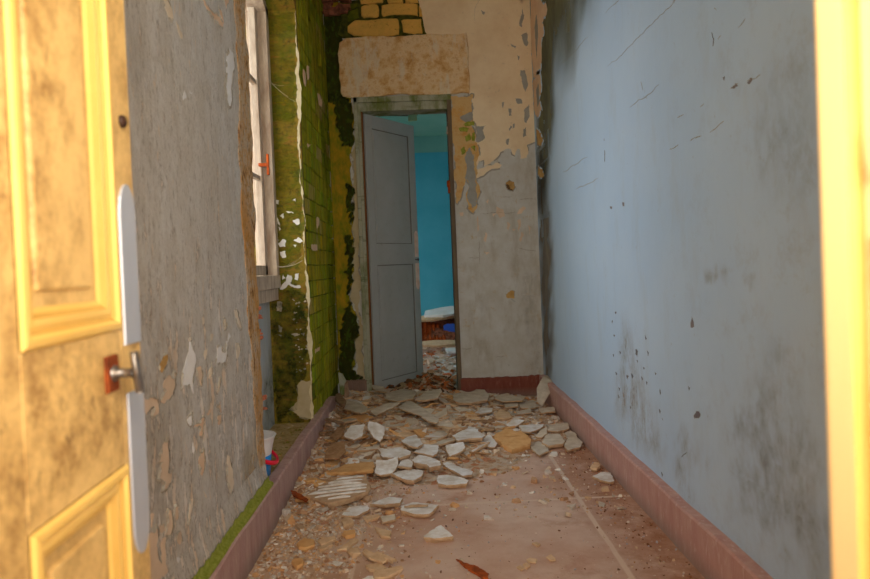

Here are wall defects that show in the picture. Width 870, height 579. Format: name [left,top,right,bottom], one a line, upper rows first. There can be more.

spalling [144,0,267,469]
peeling [276,0,547,420]
water stain [531,0,584,375]
peeling [149,498,194,579]